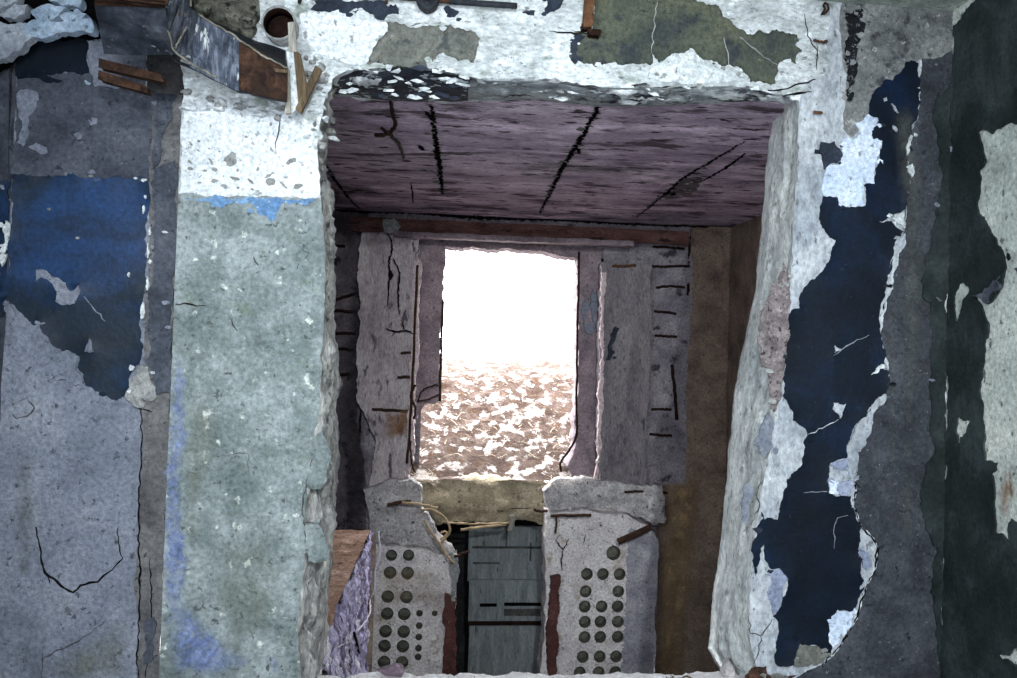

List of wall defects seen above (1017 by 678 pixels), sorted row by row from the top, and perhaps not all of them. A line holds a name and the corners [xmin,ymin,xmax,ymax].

peeling [0,0,313,401]
crack [326,106,759,337]
spalling [299,0,802,159]
spalling [533,252,668,534]
spalling [651,364,679,420]
spalling [652,230,691,268]
spalling [656,283,690,296]
spalling [663,178,702,200]
peeling [739,60,921,678]
spalling [842,8,866,103]
peeling [919,0,1017,678]
crack [35,408,153,678]